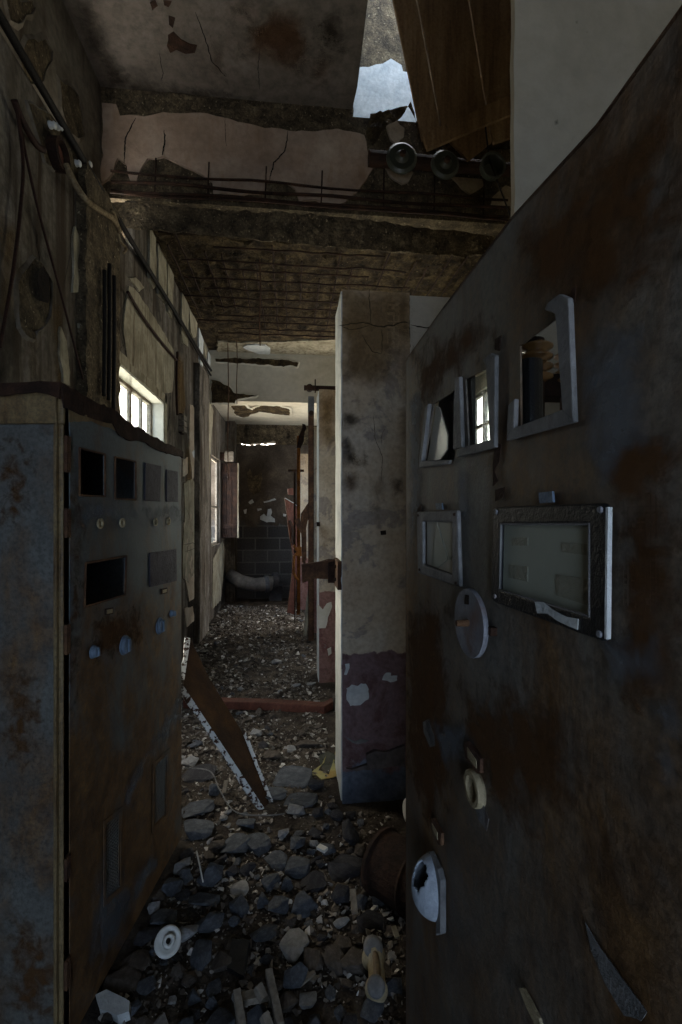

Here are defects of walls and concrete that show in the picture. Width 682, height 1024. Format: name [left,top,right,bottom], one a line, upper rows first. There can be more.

peeling [150,0,197,54]
spalling [100,59,510,474]
flaking render [244,498,286,522]
flaking render [317,602,332,628]
peeling [344,664,369,706]